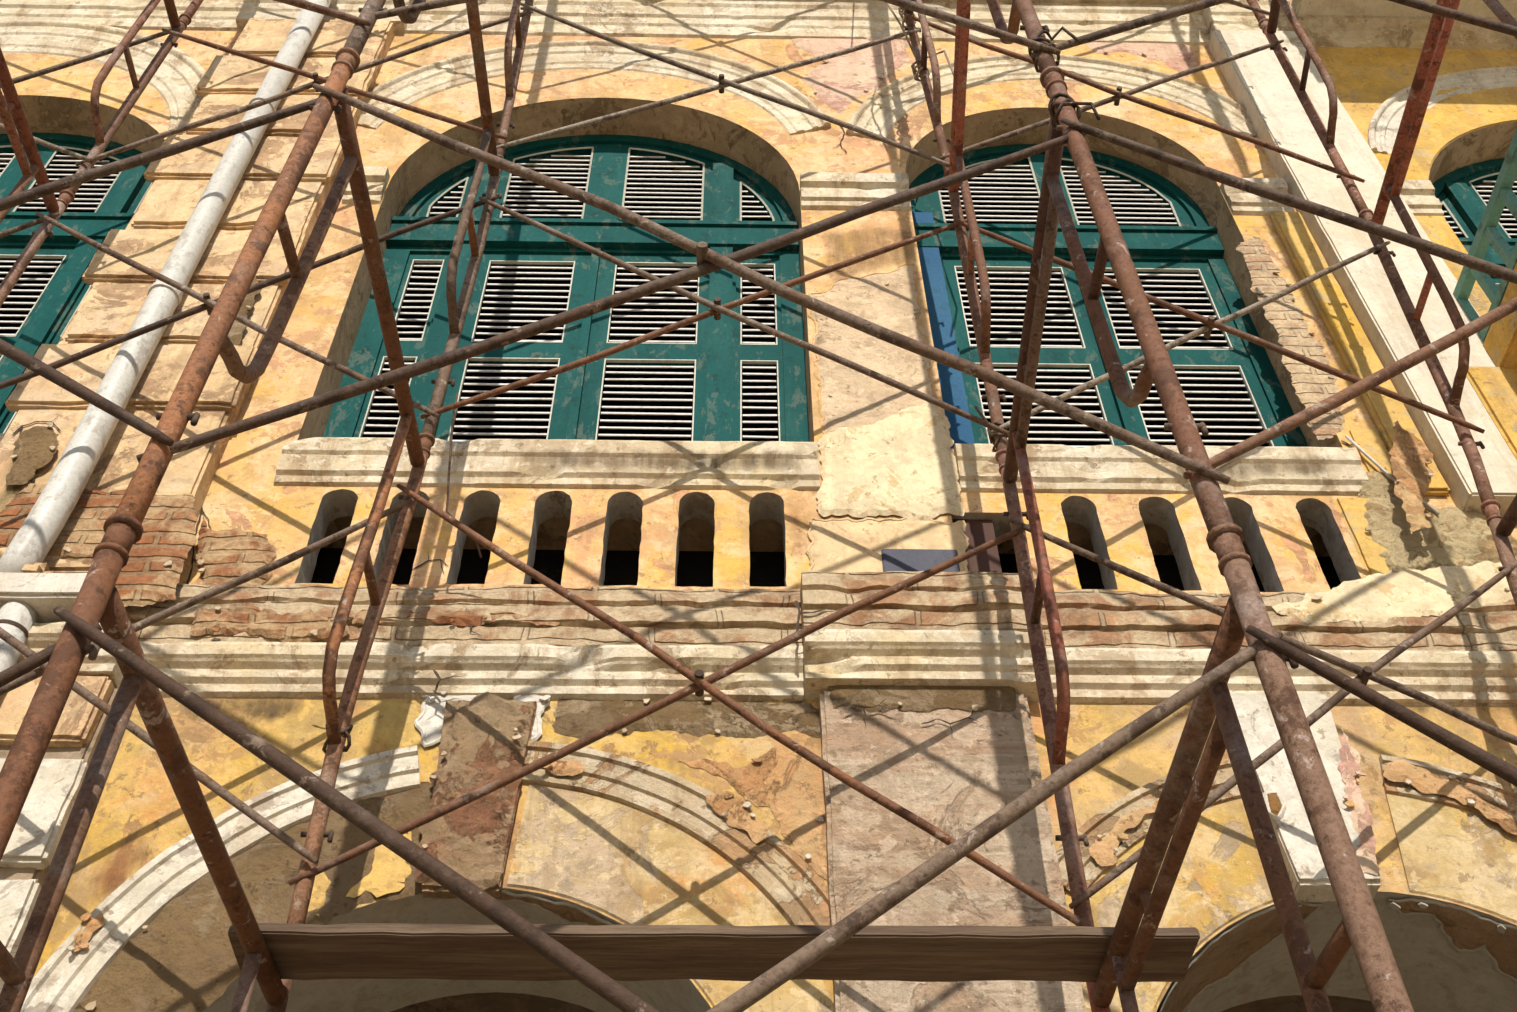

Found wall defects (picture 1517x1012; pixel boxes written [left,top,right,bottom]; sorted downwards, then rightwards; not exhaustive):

flaking render [1236,236,1345,440]
flaking render [0,421,60,548]
flaking render [47,489,126,564]
flaking render [115,493,277,607]
spalling [1389,421,1434,534]
flaking render [512,685,1016,881]
peeling [1338,722,1517,875]
peeling [1388,898,1517,988]